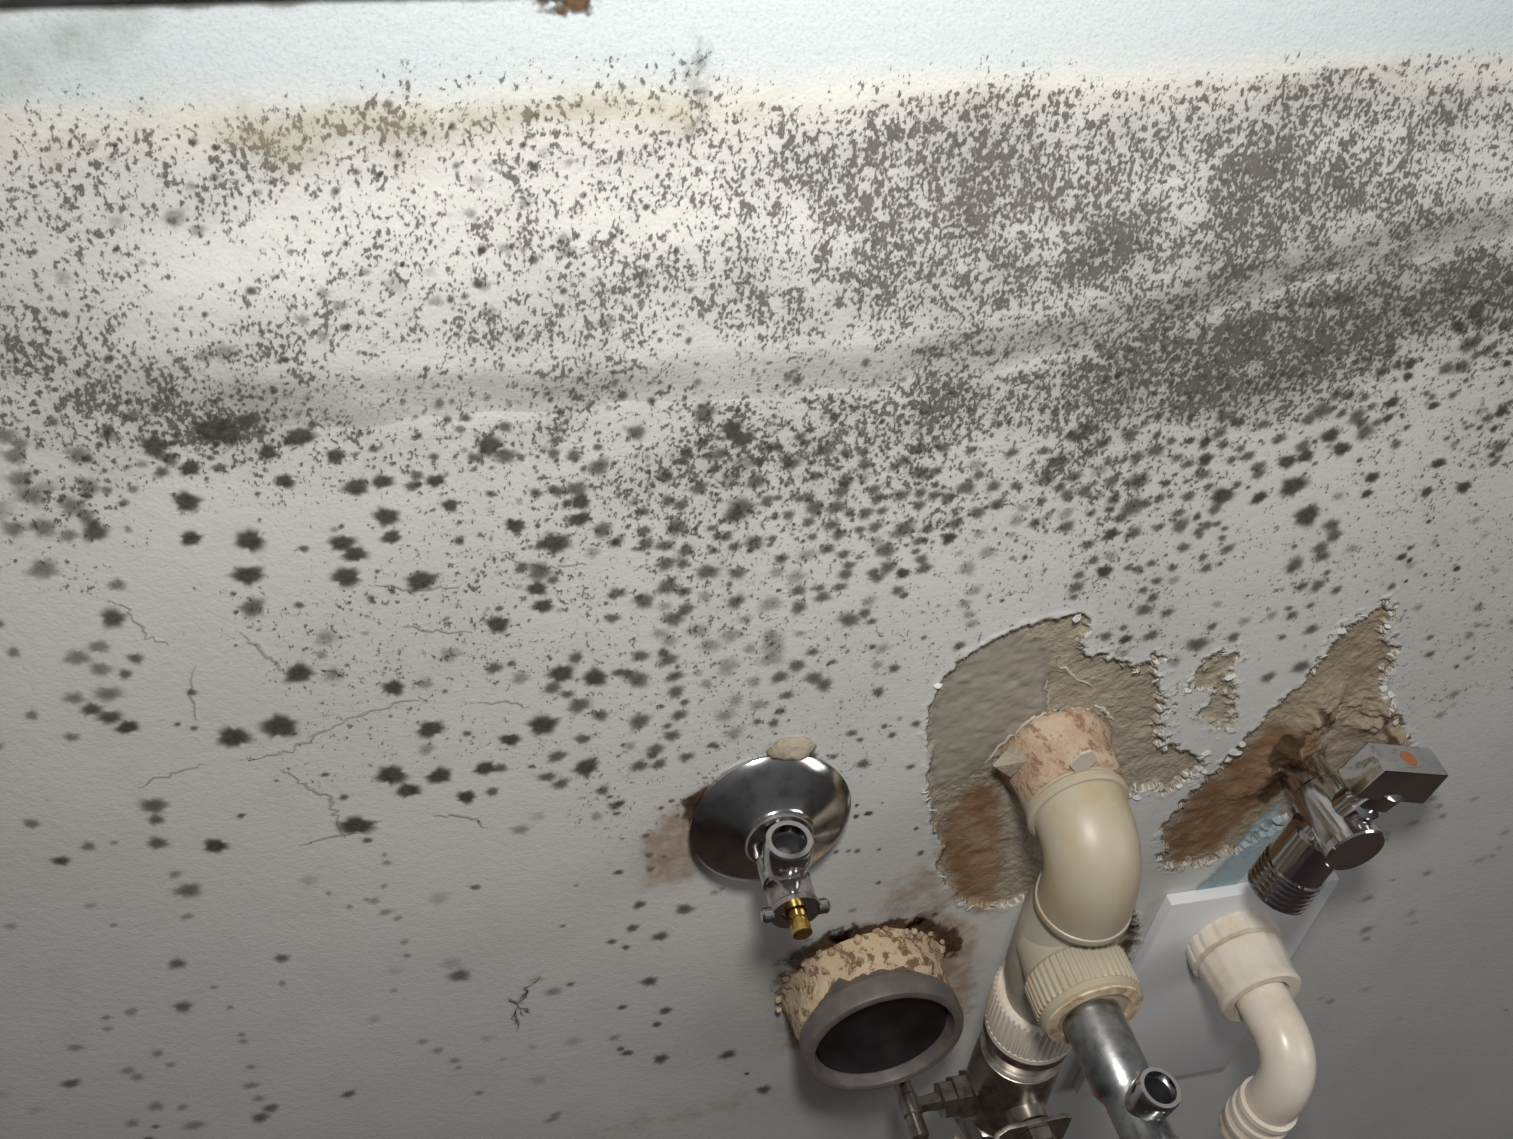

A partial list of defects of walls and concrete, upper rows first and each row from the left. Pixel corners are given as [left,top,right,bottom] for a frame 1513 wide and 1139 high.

water stain [0,51,1513,871]
flaking render [921,598,1412,911]